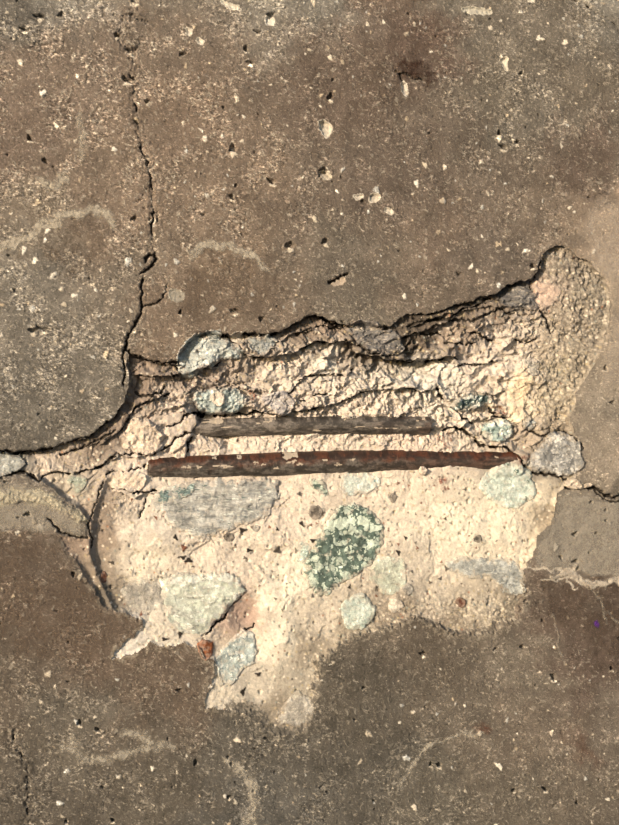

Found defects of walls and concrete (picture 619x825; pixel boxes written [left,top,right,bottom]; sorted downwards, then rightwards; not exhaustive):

crack [139,146,153,190]
crack [121,211,177,386]
crack [0,447,48,482]
spalling [0,245,611,736]
crack [47,518,88,539]